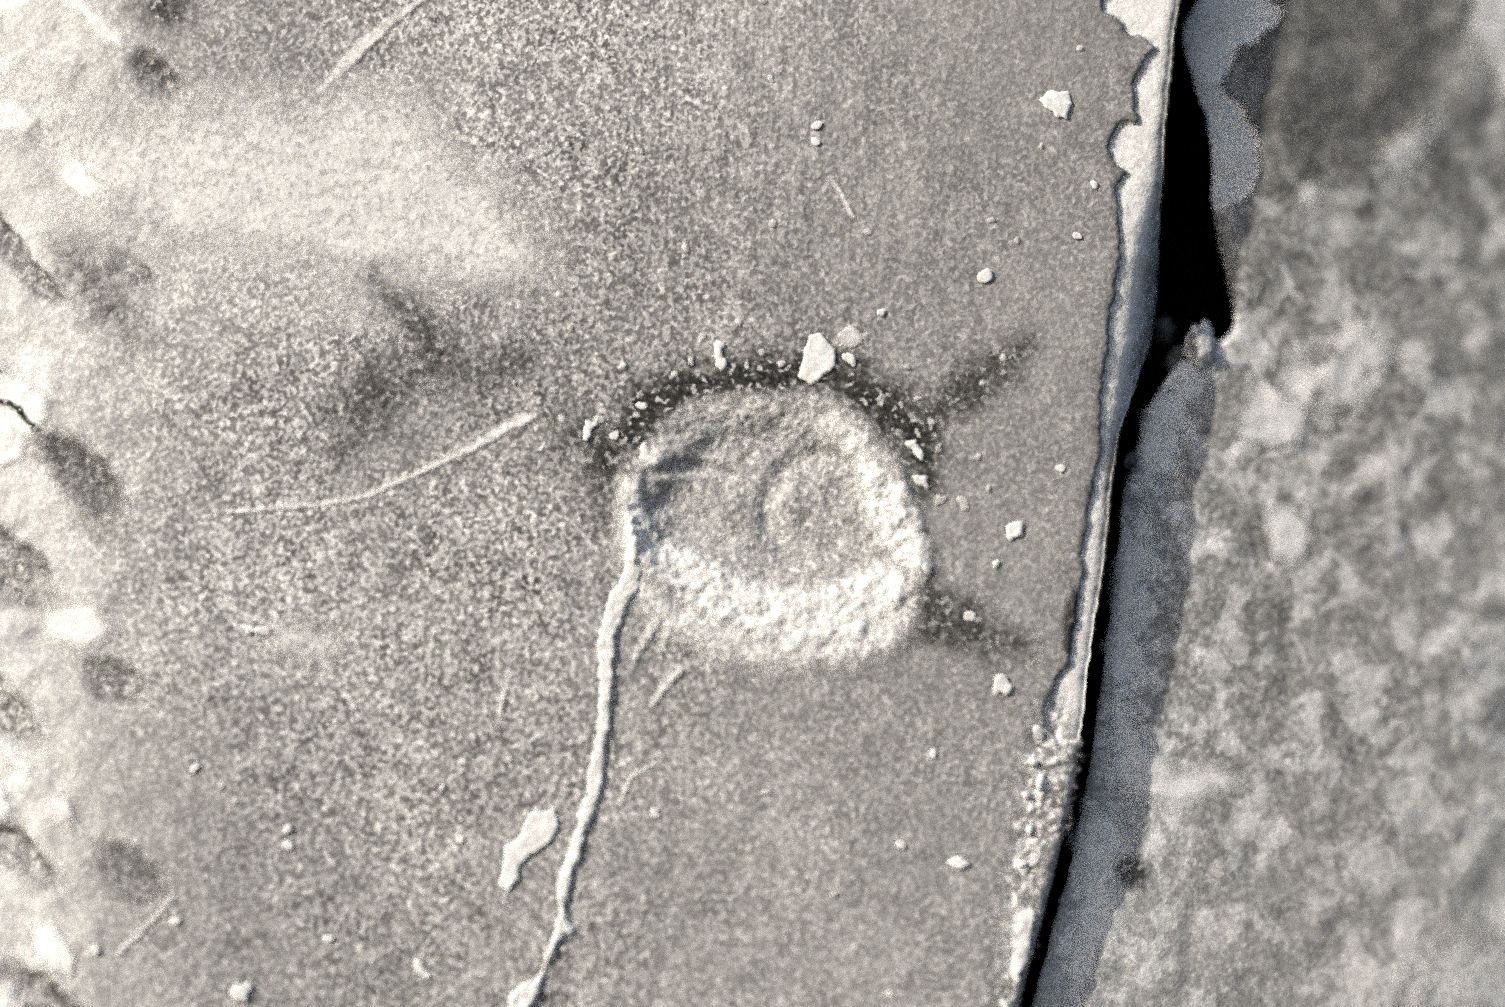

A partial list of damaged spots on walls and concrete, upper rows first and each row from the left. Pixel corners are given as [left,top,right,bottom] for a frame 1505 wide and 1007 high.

damp [0,65,557,455]
damp [270,624,343,666]
damp [533,338,1034,989]
crack [1019,0,1233,1007]
spalling [994,0,1284,1007]